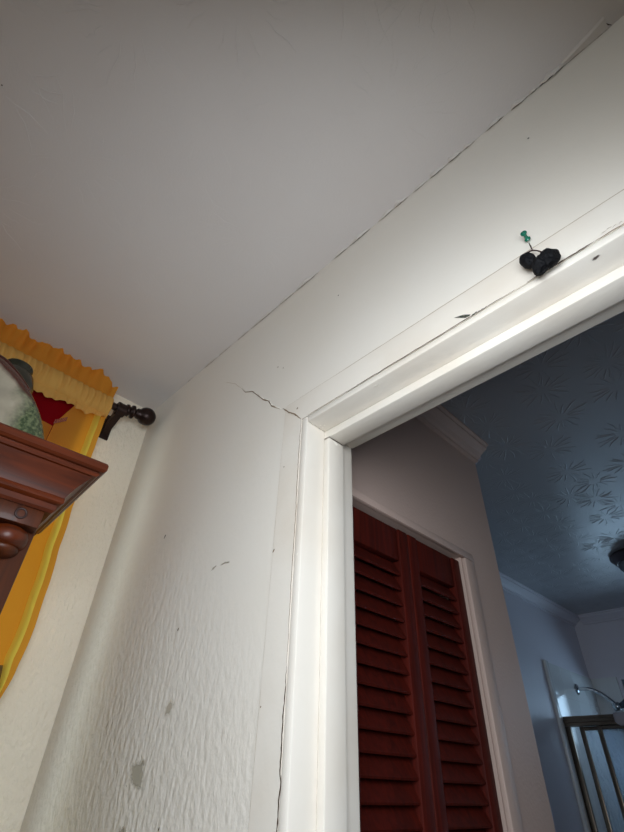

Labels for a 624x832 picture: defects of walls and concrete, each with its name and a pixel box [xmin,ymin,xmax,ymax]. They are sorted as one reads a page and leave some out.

crack [227,189,624,832]